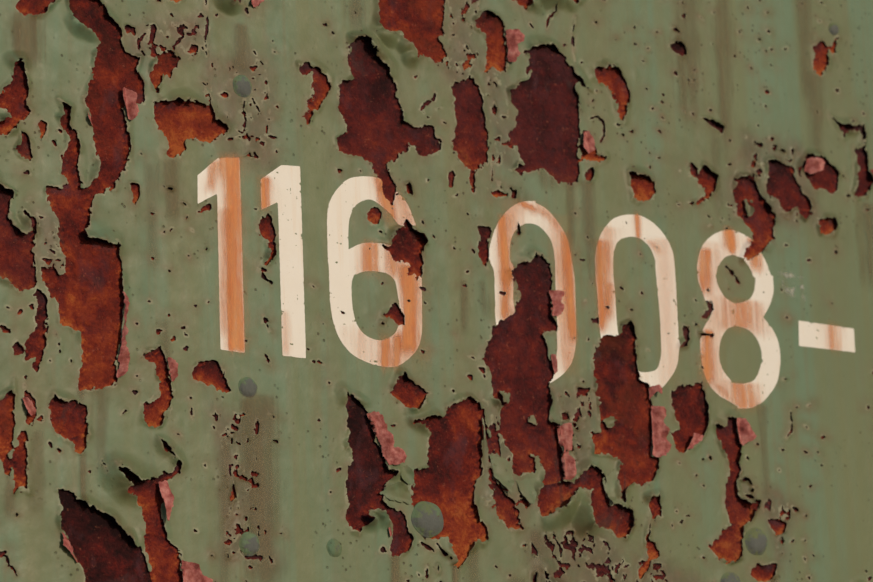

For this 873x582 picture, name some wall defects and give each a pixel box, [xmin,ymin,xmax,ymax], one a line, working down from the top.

peeling [299,0,607,206]
peeling [0,0,270,494]
corrosion [210,157,244,352]
corrosion [375,178,398,217]
corrosion [363,243,426,367]
peeling [382,219,435,291]
peeling [472,226,492,266]
corrosion [498,215,512,317]
corrosion [563,235,576,339]
corrosion [596,240,609,329]
peeling [336,253,798,582]
peeling [58,439,213,582]